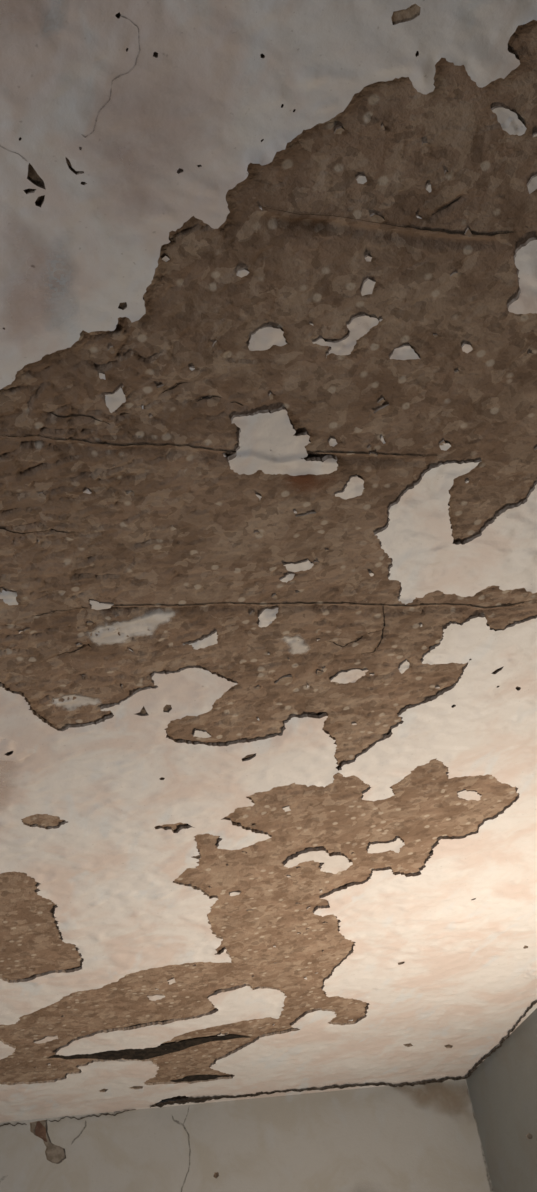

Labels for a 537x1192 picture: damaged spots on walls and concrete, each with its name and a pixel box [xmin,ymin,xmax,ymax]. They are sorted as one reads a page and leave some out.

peeling [391,4,420,24]
peeling [0,20,537,768]
peeling [0,759,518,1088]
crack [0,1001,537,1192]